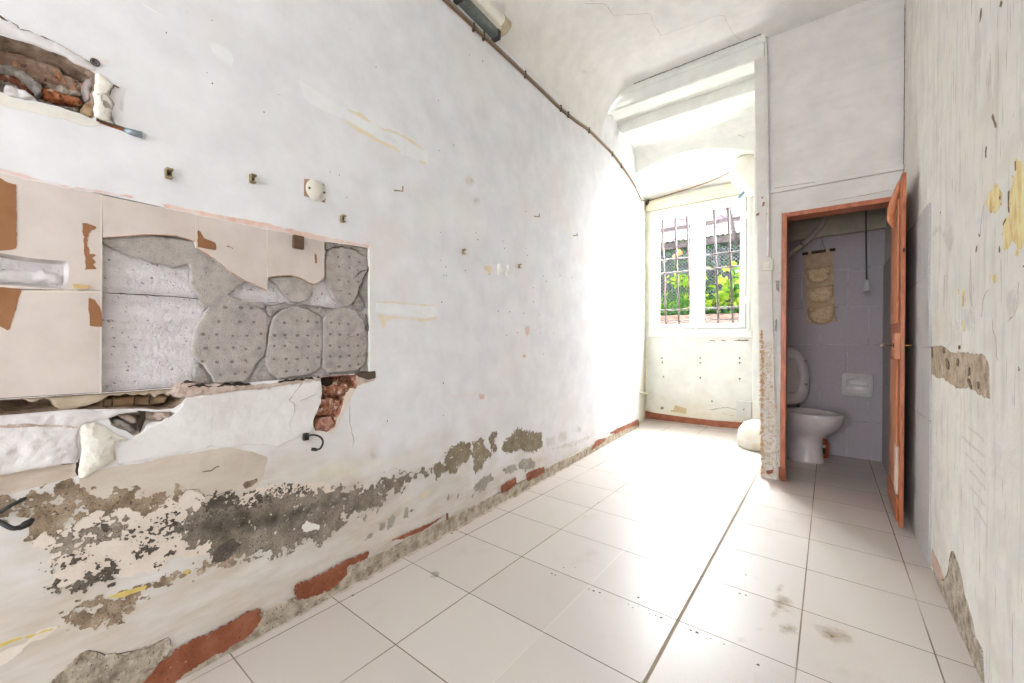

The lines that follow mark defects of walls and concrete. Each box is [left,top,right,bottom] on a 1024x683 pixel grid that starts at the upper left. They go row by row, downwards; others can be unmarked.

spalling [0,19,119,127]
peeling [975,159,1024,267]
flaking render [0,234,375,435]
damp [199,441,431,529]
damp [458,425,511,442]
spalling [759,319,780,478]
spalling [931,290,999,399]
damp [40,504,190,595]
damp [211,538,241,563]
peeling [0,428,543,666]
spalling [931,549,984,683]